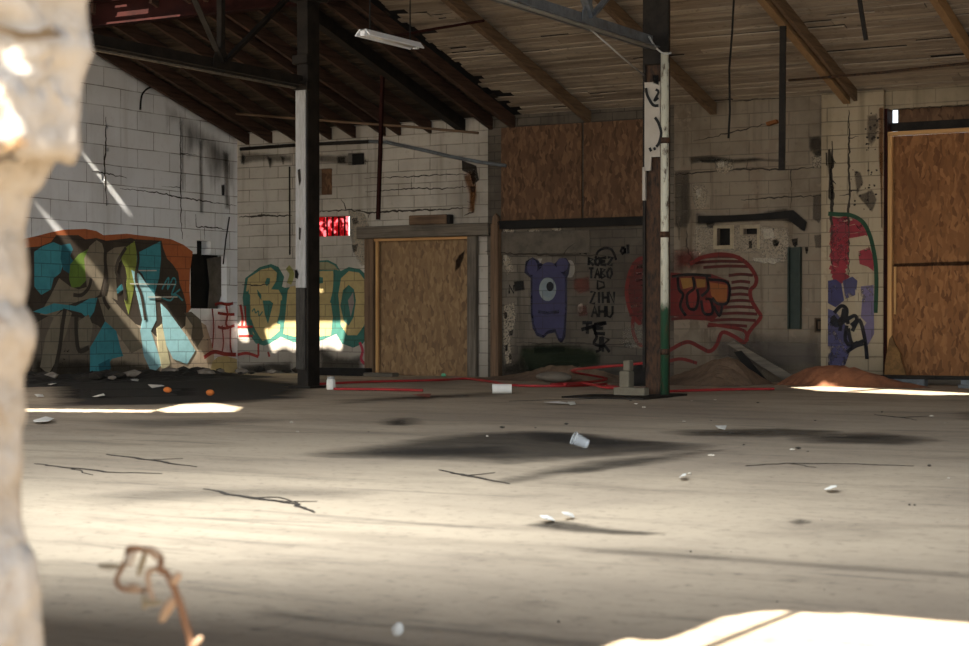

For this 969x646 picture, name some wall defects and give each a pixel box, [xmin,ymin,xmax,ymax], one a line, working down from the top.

peeling [865,112,881,151]
crack [93,119,292,239]
water stain [188,128,228,211]
spalling [462,161,479,193]
crack [671,112,862,276]
peeling [851,169,878,210]
crack [34,454,317,513]